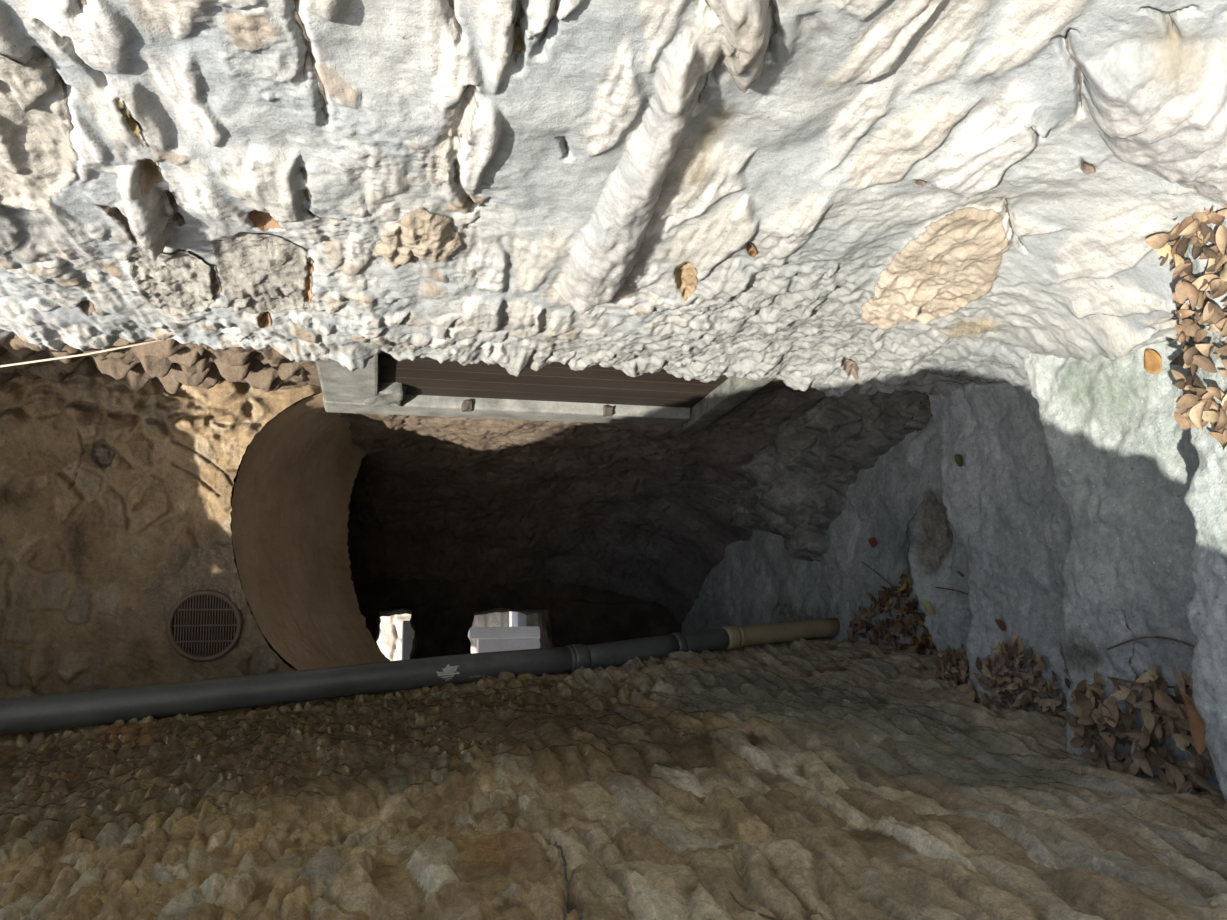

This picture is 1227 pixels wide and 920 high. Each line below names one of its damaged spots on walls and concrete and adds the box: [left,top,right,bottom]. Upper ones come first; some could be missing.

spalling [0,53,77,261]
spalling [99,205,314,328]
spalling [372,208,462,270]
spalling [858,208,1013,330]